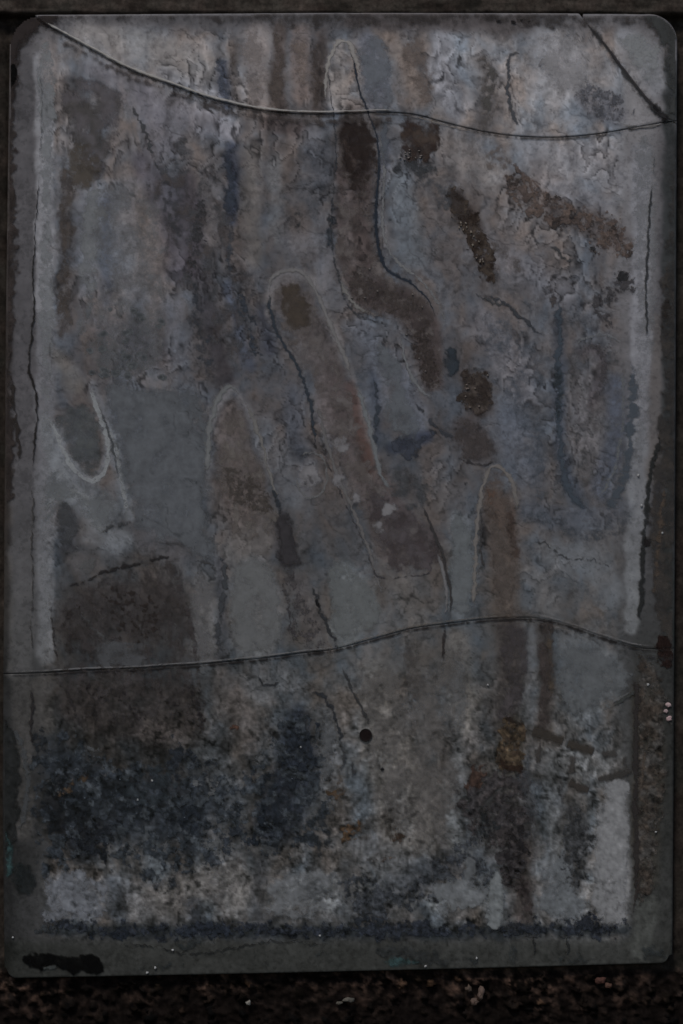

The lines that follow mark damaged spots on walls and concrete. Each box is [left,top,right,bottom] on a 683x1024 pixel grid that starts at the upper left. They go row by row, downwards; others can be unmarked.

crack [50,24,668,139]
crack [28,181,39,463]
rust [504,162,634,258]
crack [645,157,655,334]
crack [16,493,670,741]
leakage [6,555,631,943]
crack [340,748,356,776]
rust [464,717,527,791]
rust [631,635,673,906]